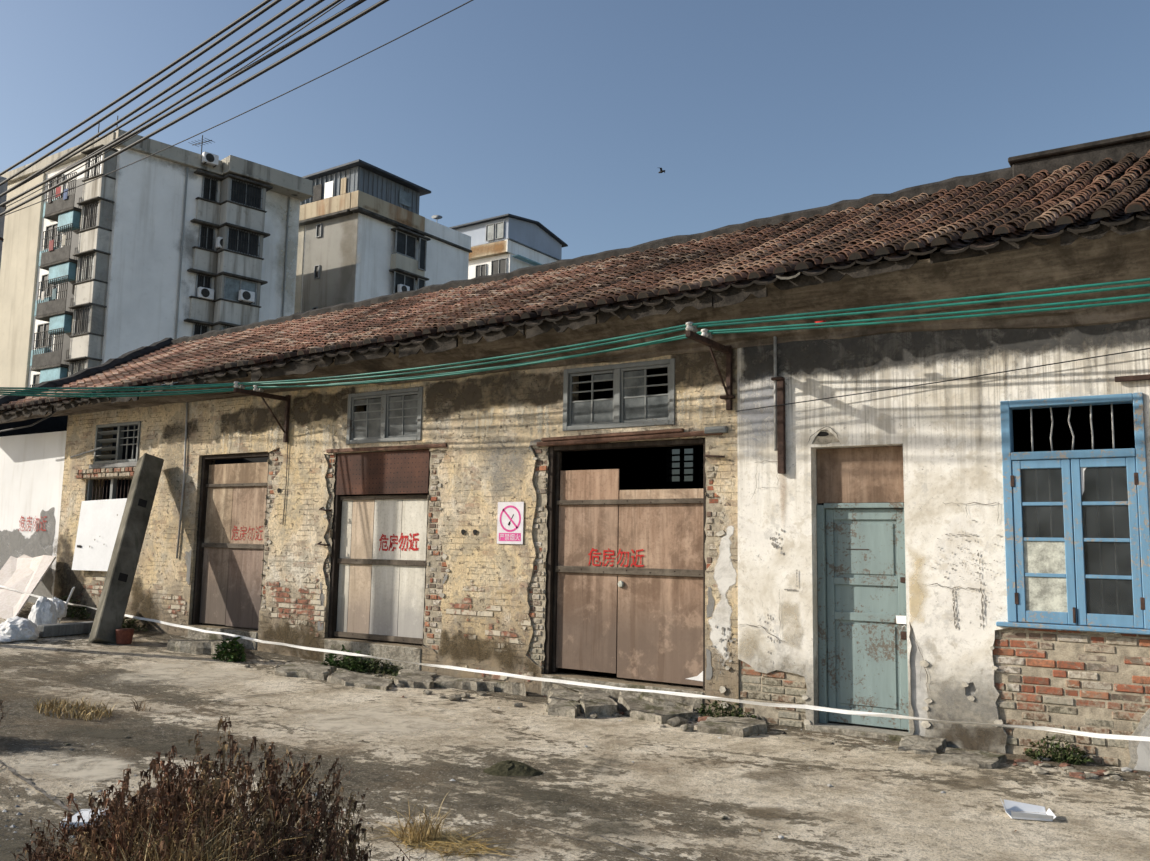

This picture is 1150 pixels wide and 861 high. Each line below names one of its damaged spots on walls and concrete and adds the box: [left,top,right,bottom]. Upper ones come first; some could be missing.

water stain [425,371,564,431]
rust [771,377,786,474]
water stain [671,318,1150,440]
peeling [260,448,336,637]
spalling [423,445,549,682]
spalling [712,614,811,728]